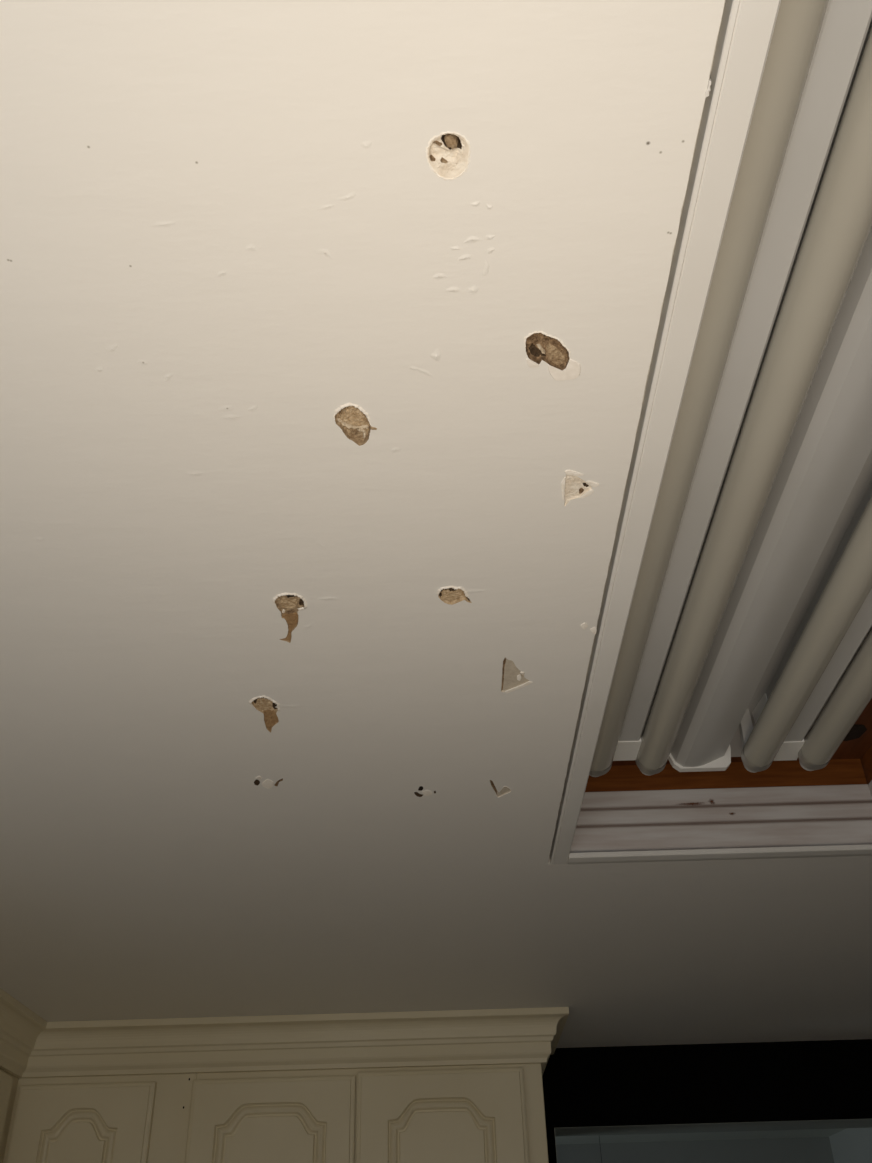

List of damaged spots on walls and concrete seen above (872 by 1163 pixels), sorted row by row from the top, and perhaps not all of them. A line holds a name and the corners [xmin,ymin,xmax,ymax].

spalling [425,131,471,180]
spalling [524,331,581,381]
spalling [333,403,377,446]
spalling [561,470,599,506]
spalling [437,586,488,605]
spalling [273,593,340,643]
spalling [501,657,532,693]
spalling [249,695,305,733]